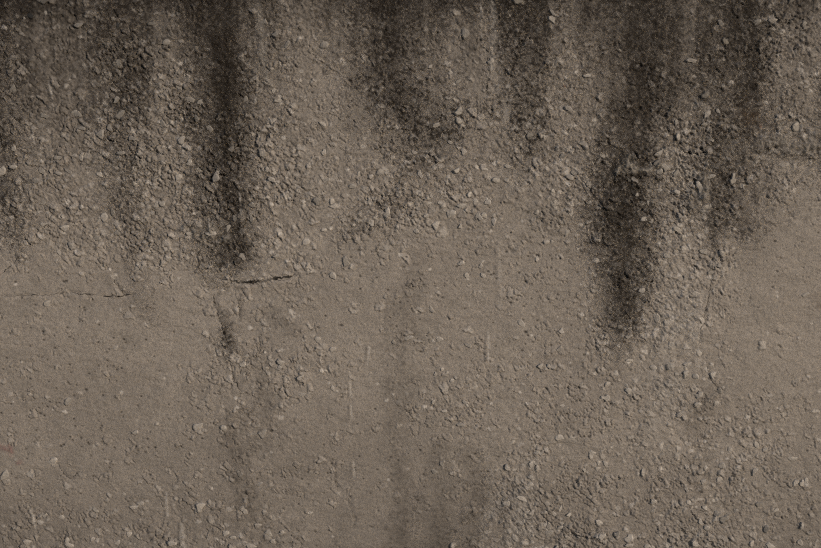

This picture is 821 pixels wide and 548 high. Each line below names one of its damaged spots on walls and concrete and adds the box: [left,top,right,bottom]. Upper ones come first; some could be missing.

damp [0,0,273,110]
damp [322,0,547,60]
damp [578,0,813,103]
crack [213,276,291,334]